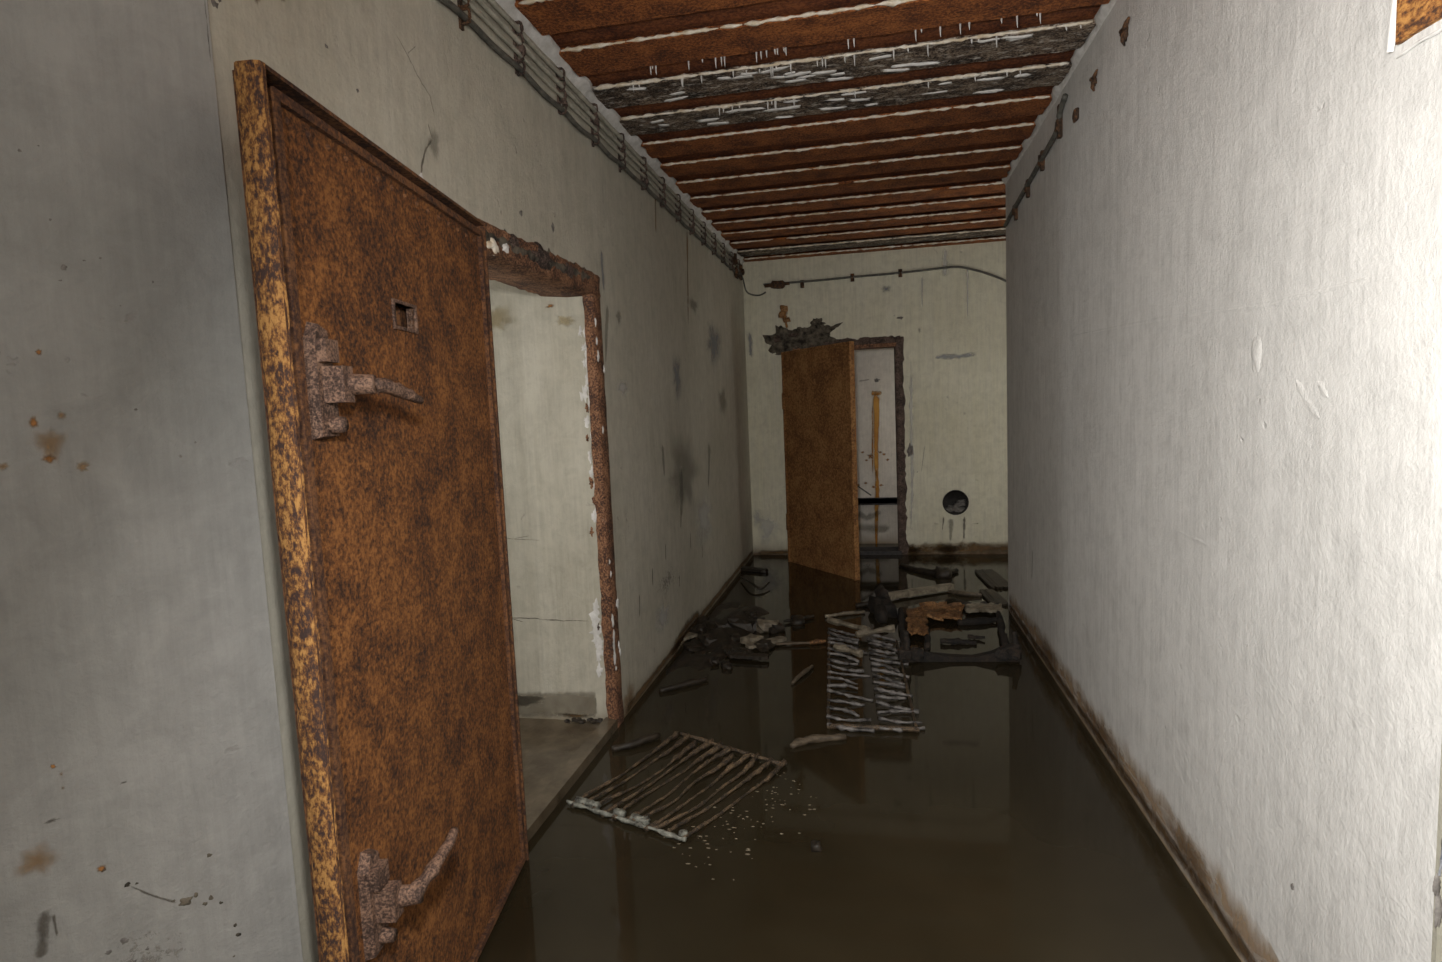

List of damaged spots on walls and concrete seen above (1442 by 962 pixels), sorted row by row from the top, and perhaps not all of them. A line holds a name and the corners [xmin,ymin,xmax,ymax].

spalling [749,318,843,355]
damp [1009,599,1277,962]
spalling [1432,842,1442,928]